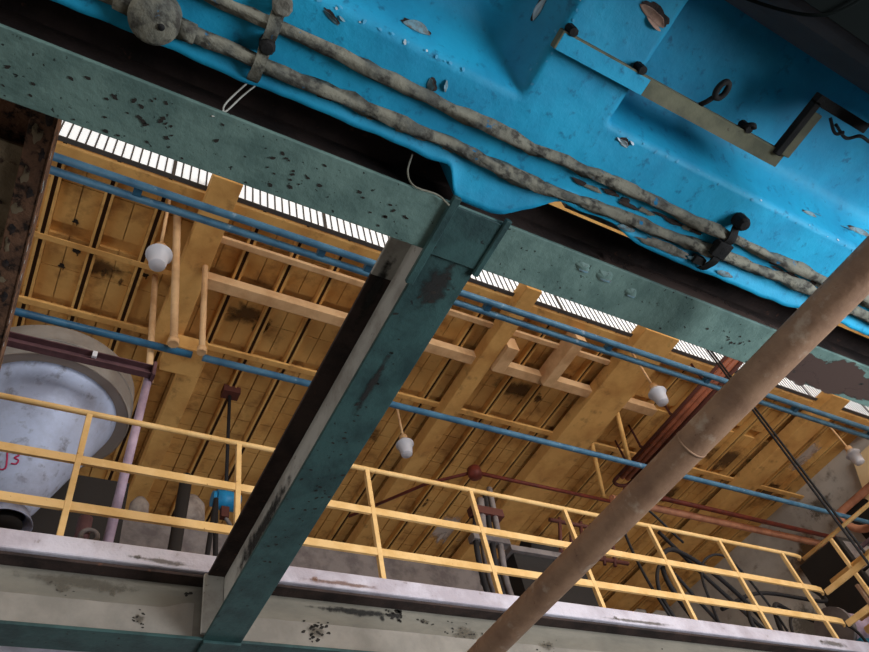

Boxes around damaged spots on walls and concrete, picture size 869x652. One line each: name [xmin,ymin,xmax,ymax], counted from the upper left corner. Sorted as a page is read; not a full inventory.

peeling [317,0,345,26]
peeling [401,17,431,35]
peeling [530,0,546,21]
peeling [640,0,670,31]